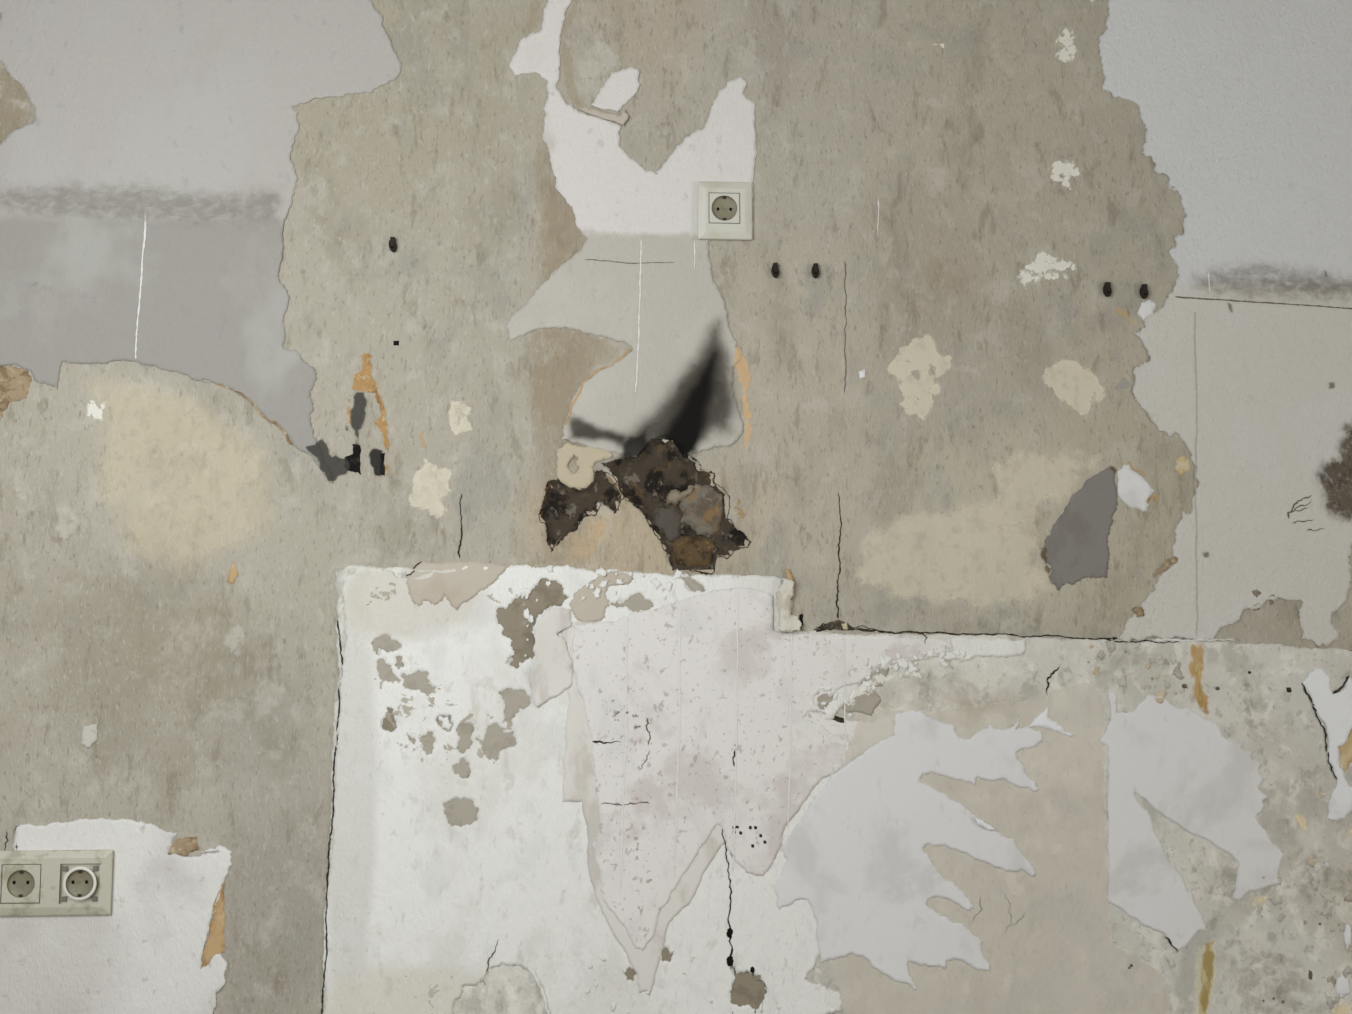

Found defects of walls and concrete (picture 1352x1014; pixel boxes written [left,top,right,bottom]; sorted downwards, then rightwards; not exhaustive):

leakage [1319,425,1352,519]
peeling [322,437,1352,1014]
crack [721,830,767,991]